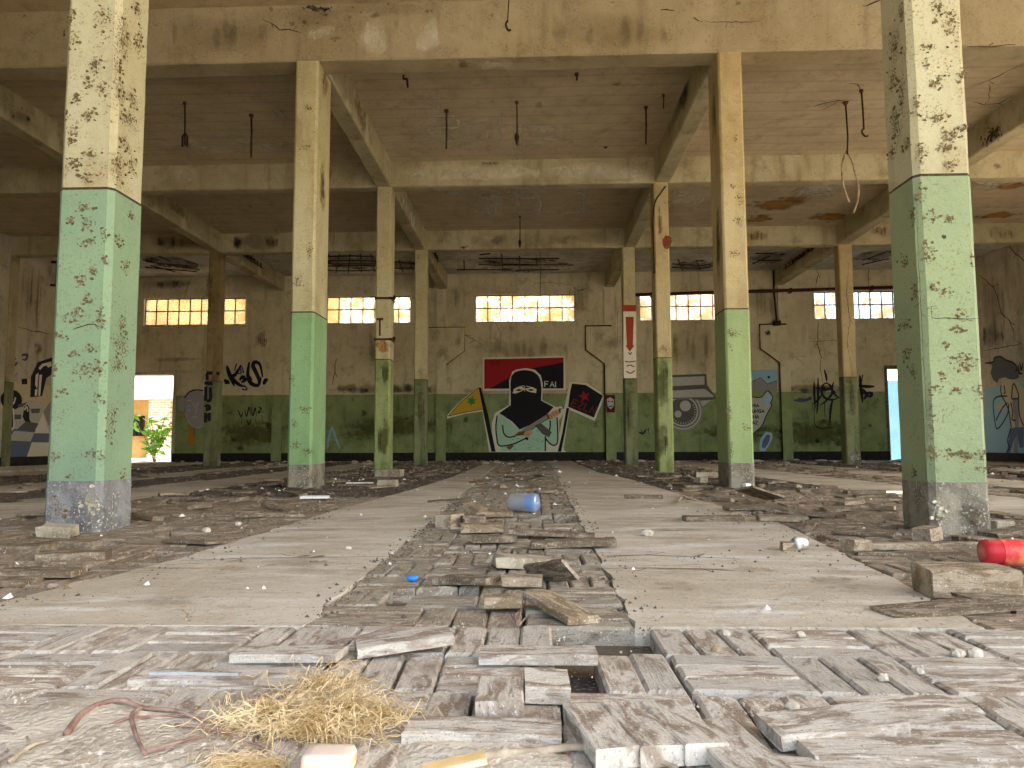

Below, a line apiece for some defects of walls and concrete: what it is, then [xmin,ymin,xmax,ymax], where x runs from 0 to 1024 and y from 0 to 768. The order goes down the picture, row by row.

crack [967,43,1024,105]
rust [748,197,804,222]
spalling [328,254,376,273]
spalling [457,246,574,272]
spalling [752,248,814,270]
crack [915,201,1022,417]
water stain [656,369,668,408]